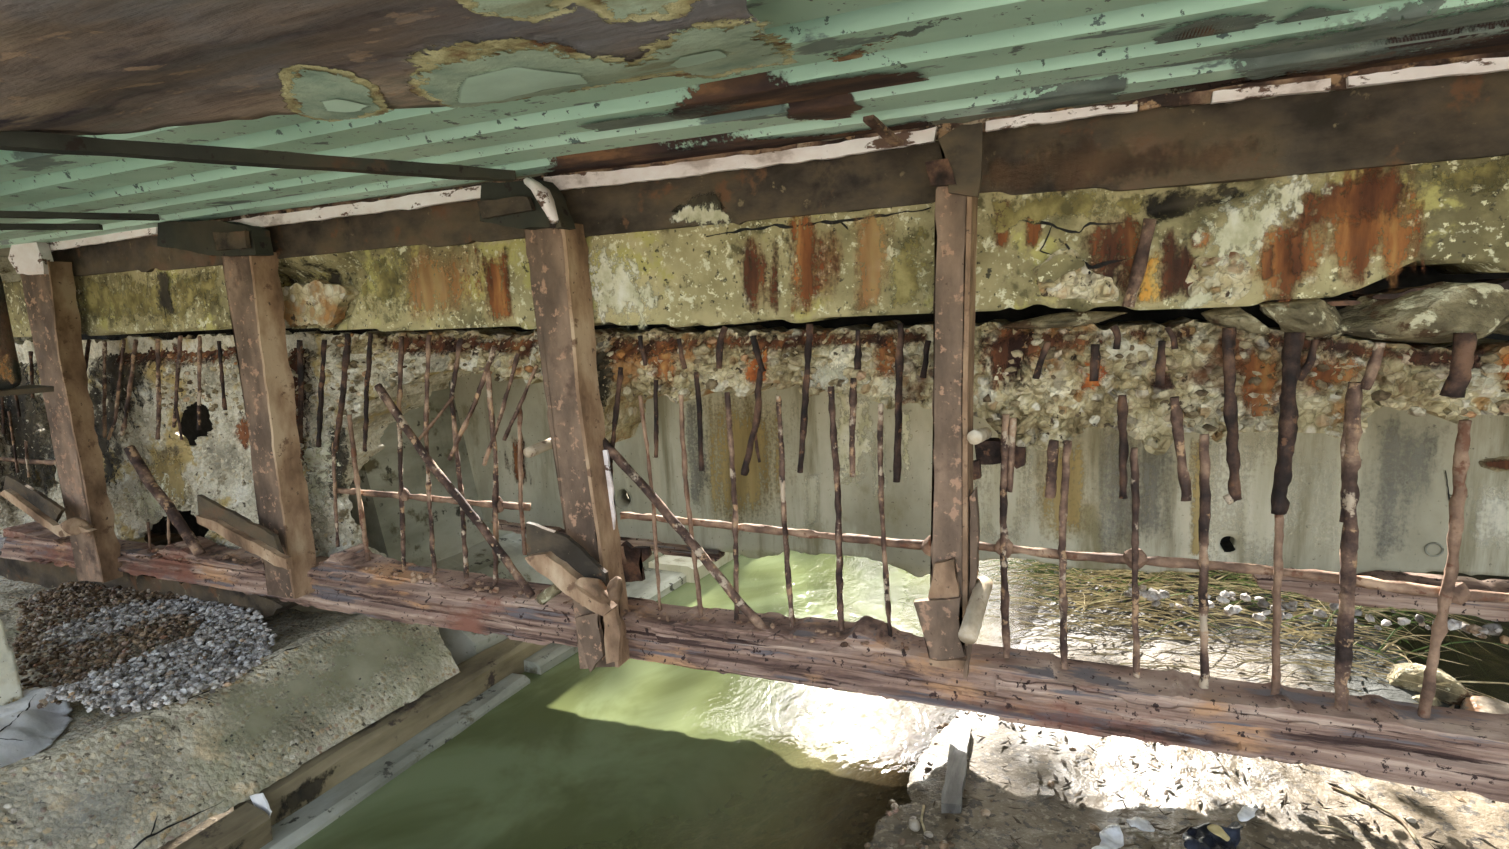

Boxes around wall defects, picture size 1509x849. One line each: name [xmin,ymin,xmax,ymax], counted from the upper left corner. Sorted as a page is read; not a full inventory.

peeling [1153,0,1509,80]
corrosion [0,0,932,176]
peeling [579,104,731,132]
peeling [988,75,1127,111]
leakage [281,258,352,287]
corrosion [607,215,928,384]
crack [994,219,1126,283]
corrosion [1082,214,1210,301]
corrosion [1256,167,1425,304]
spalling [281,280,542,417]
corrosion [979,325,1193,393]
flaking render [983,327,1272,432]